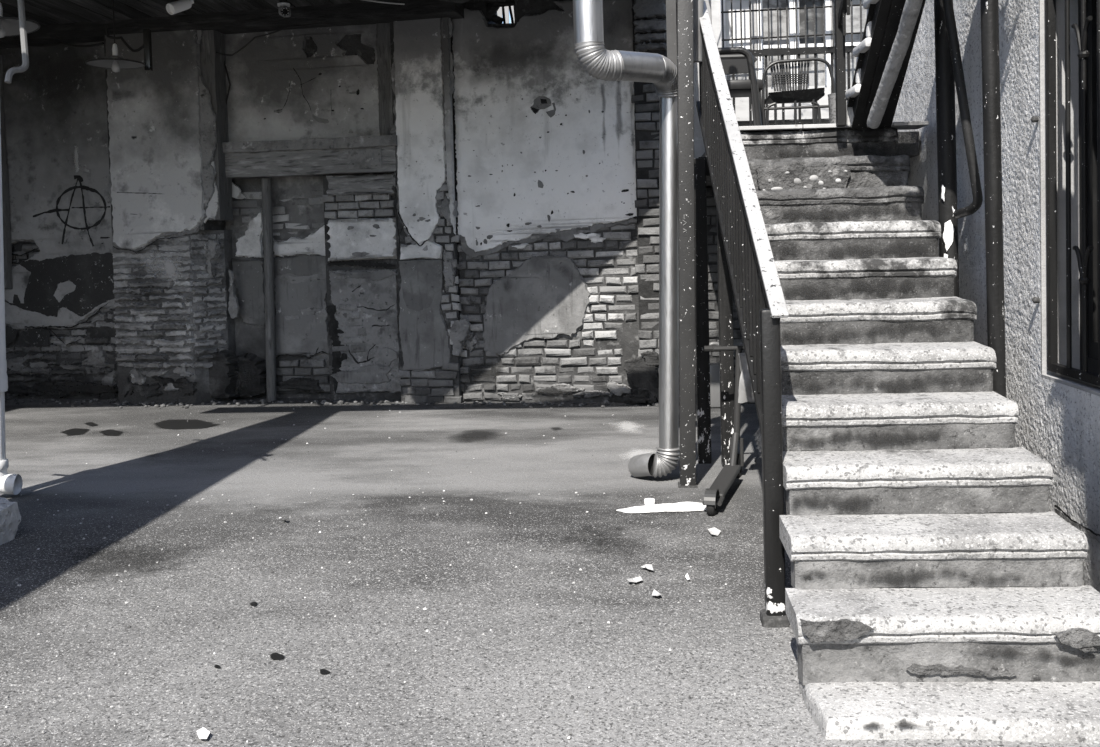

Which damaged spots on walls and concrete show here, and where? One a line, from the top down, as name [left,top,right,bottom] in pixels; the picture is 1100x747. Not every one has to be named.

flaking render [5,161,240,398]
flaking render [232,182,638,404]
crack [1054,505,1100,536]
spalling [907,663,1017,678]